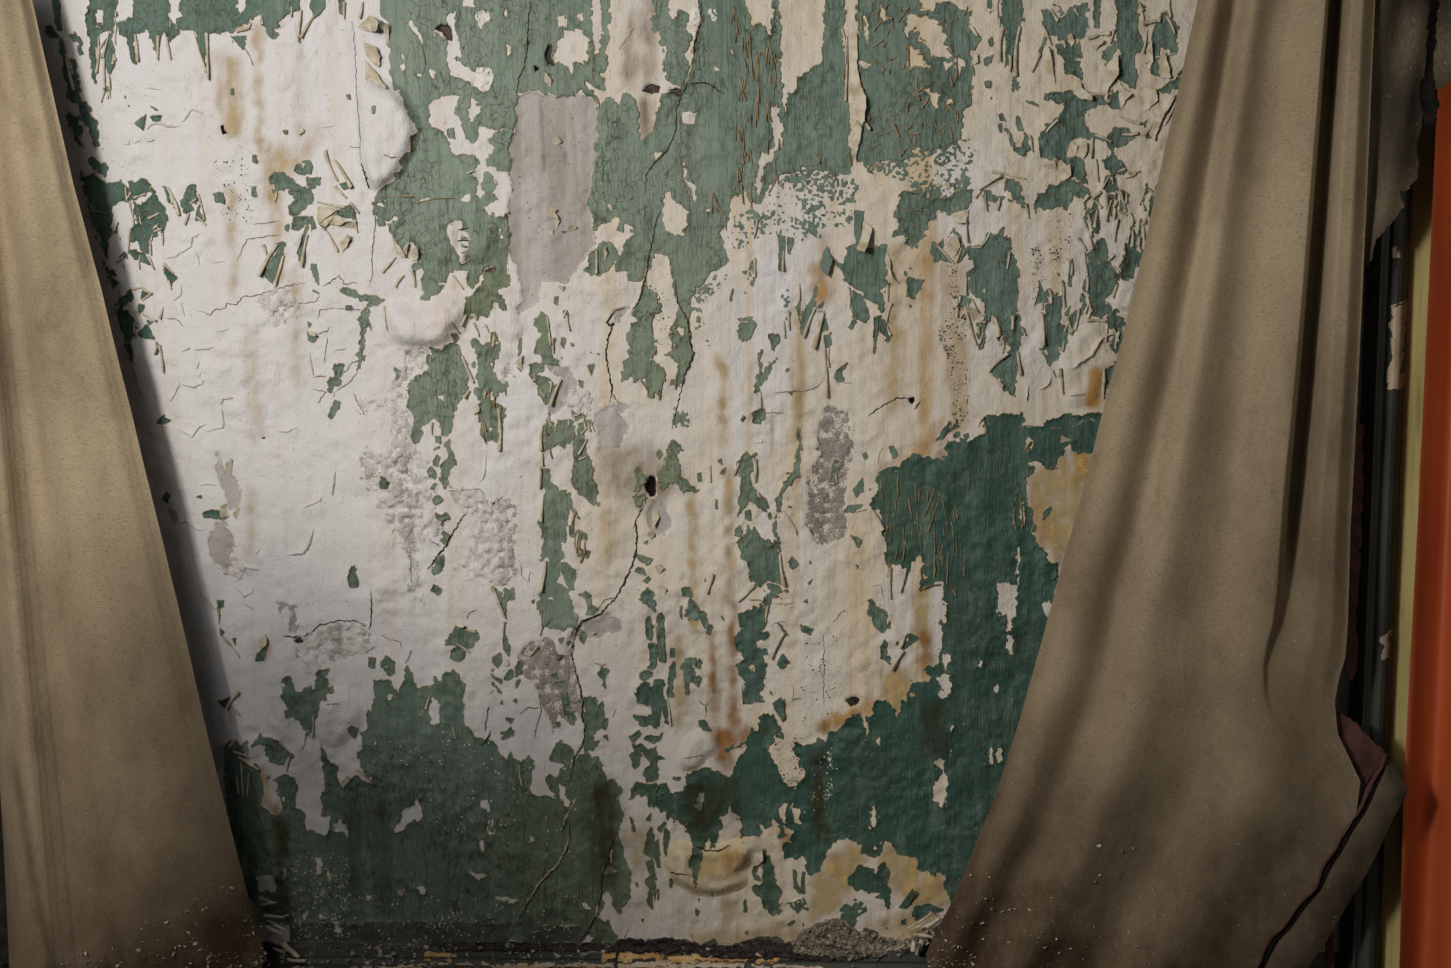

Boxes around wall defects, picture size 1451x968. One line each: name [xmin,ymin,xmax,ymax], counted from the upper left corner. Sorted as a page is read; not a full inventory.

crack [605,1,724,426]
crack [481,691,542,746]
crack [518,499,647,920]
peeling [45,0,1183,968]
corrosion [709,656,736,692]
corrosion [716,703,750,762]